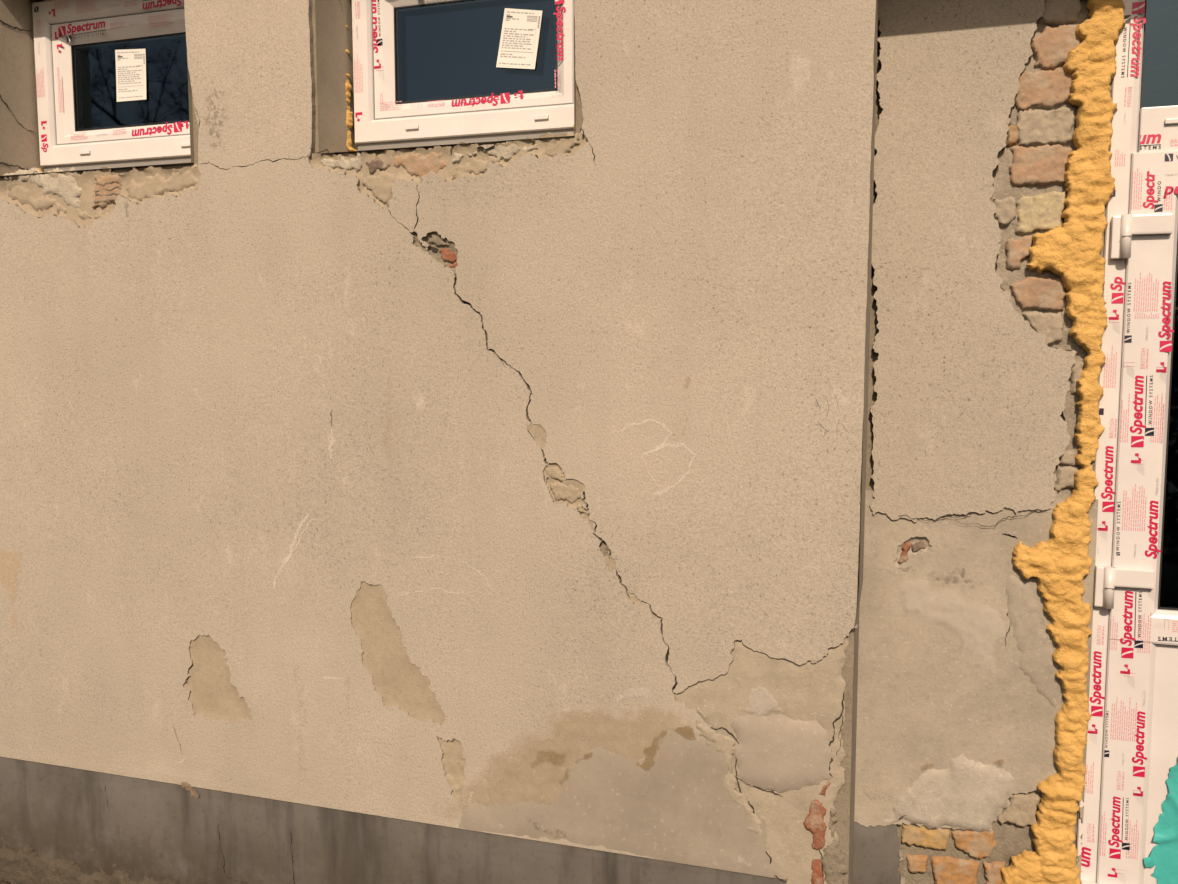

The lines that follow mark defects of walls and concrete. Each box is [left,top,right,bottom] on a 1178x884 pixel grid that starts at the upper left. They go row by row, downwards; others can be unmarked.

crack [0,20,32,31]
spalling [0,164,201,228]
spalling [310,132,588,208]
flaking render [991,0,1094,498]
crack [455,279,532,422]
spalling [894,536,932,569]
crack [899,509,1045,538]
crack [617,572,678,690]
peeling [184,635,253,722]
peeling [350,581,466,799]
spalling [674,587,860,884]
flaking render [896,790,1042,884]